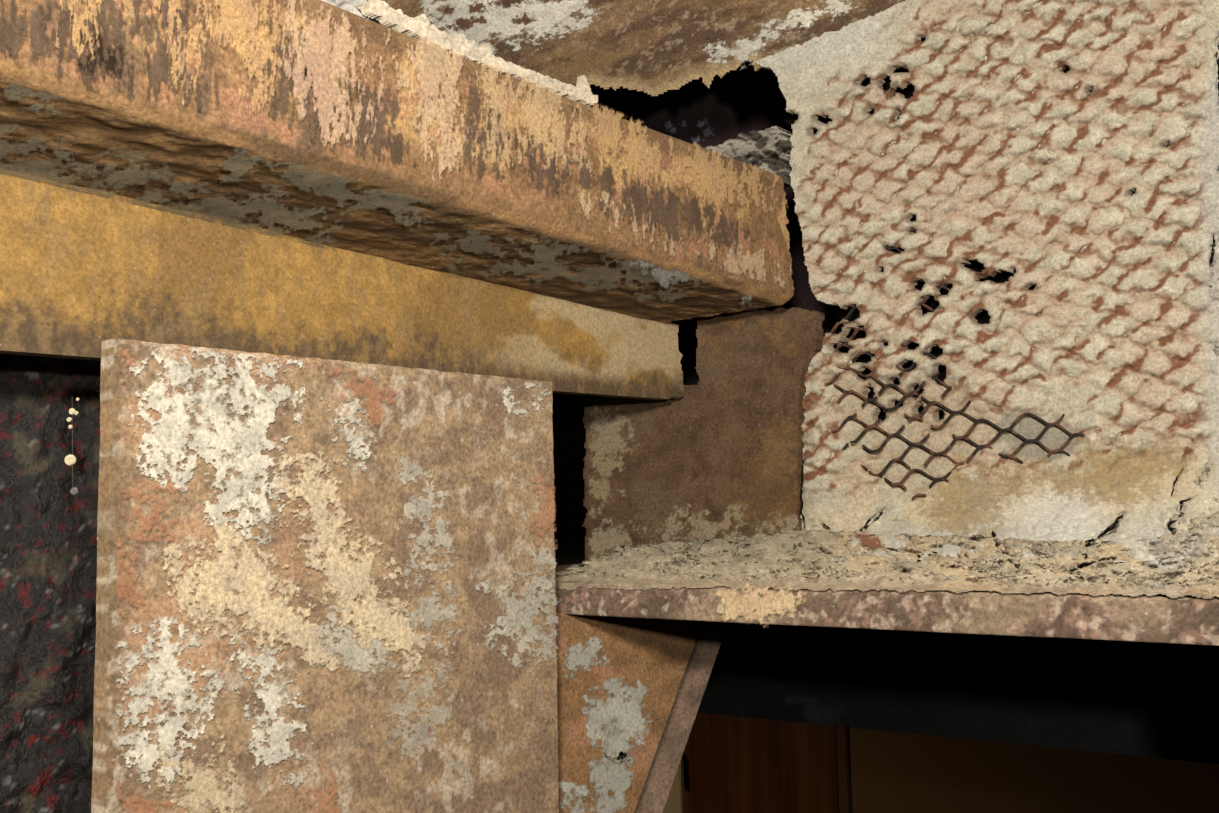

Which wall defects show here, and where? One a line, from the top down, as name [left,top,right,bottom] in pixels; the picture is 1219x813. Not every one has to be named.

peeling [418,0,602,55]
peeling [703,0,860,69]
crack [1211,45,1219,95]
corrosion [0,0,791,286]
peeling [0,125,709,302]
spalling [964,259,1016,283]
crack [1208,234,1216,266]
spalling [822,307,924,421]
corrosion [529,474,555,537]
corrosion [722,405,804,531]
crack [1167,467,1192,535]
corrosion [118,483,180,619]